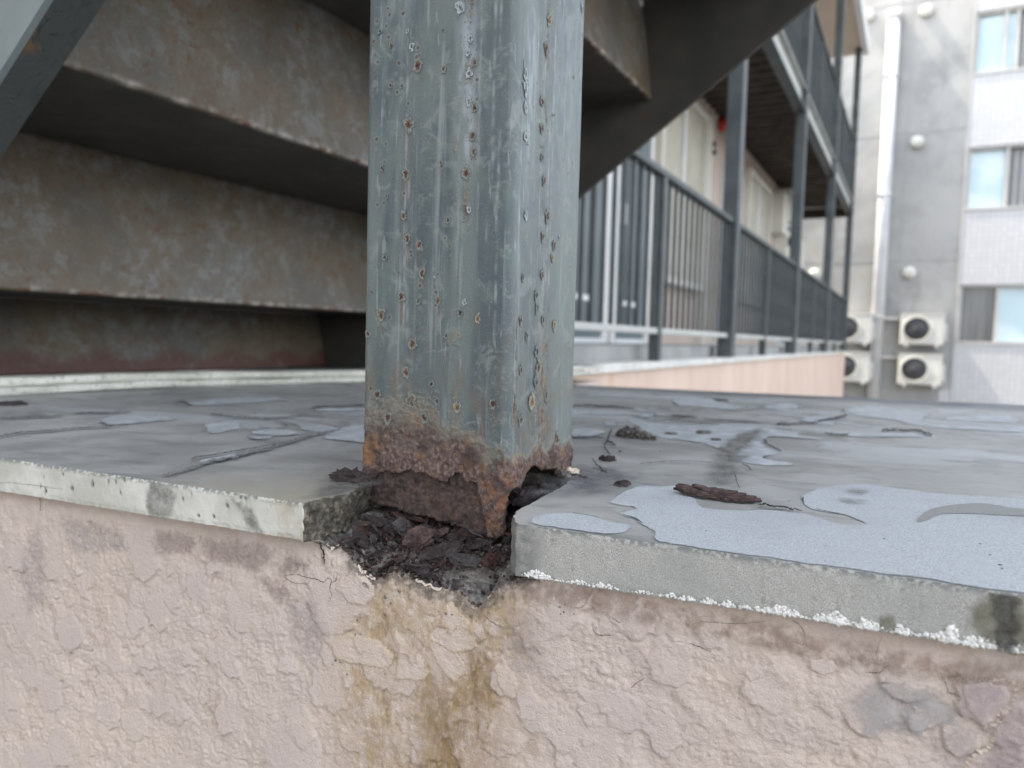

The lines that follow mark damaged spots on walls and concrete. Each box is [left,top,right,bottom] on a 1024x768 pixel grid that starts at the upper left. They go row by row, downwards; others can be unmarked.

corrosion [461,130,477,181]
corrosion [508,467,580,506]
crack [282,541,338,602]
corrosion [368,516,464,561]
efflorescence [522,569,619,591]
peeling [313,484,1024,608]
damp [632,590,1024,654]